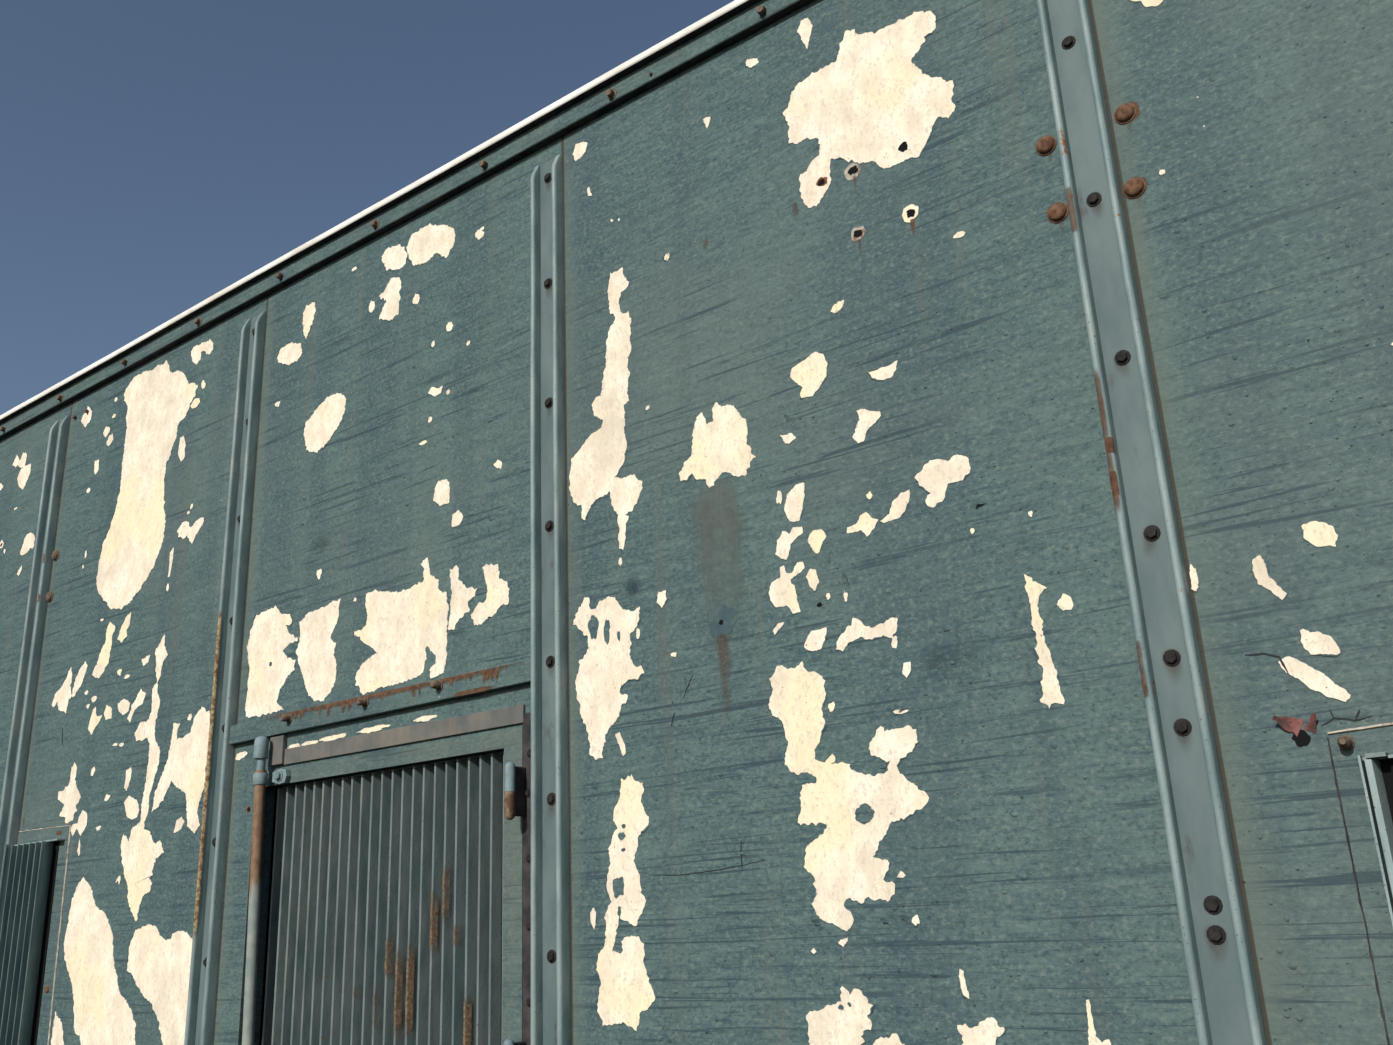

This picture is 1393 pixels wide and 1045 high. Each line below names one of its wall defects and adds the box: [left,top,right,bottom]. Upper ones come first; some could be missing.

peeling [782,10,956,209]
peeling [568,267,644,566]
peeling [678,402,757,489]
peeling [51,338,214,1045]
peeling [245,557,511,719]
corrosion [274,665,506,720]
peeling [573,589,669,761]
peeling [767,482,930,948]
corrosion [384,871,458,1029]
corrosion [463,1000,472,1045]
peeling [589,774,656,1032]
peeling [805,985,907,1045]